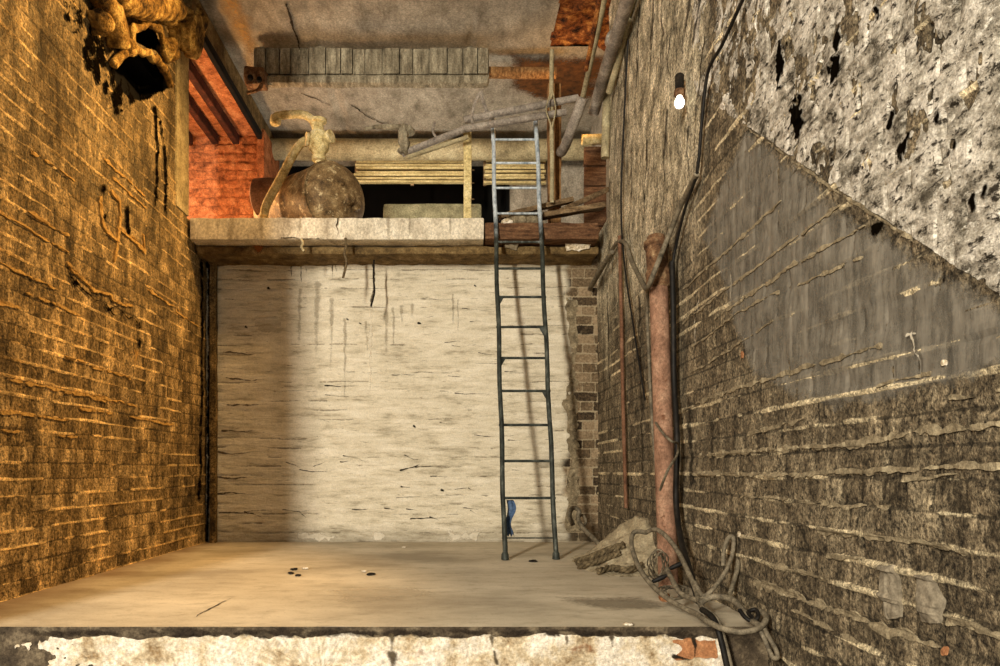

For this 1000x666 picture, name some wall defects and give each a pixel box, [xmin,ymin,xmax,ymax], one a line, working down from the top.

crack [285,4,300,50]
corrosion [510,0,603,100]
crack [152,106,168,213]
peeling [692,0,1000,294]
flaking render [562,298,582,533]
peeling [15,633,723,666]